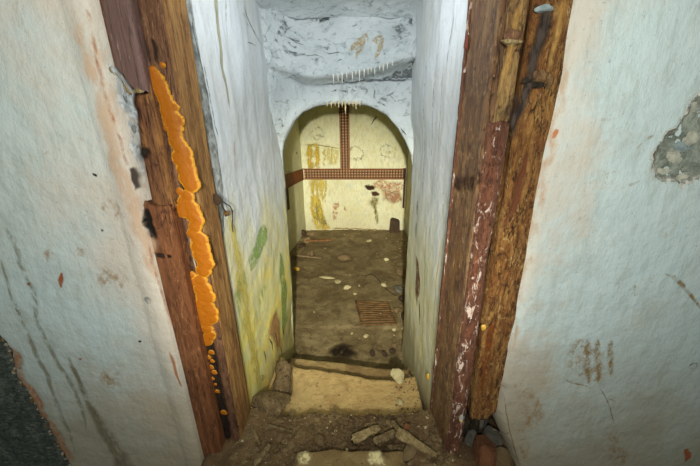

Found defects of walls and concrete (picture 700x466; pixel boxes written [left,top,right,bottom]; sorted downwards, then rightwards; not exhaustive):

leakage [328,61,414,84]
leakage [307,144,338,168]
spalling [651,92,700,189]
leakage [310,180,377,230]
corrosion [577,341,601,385]